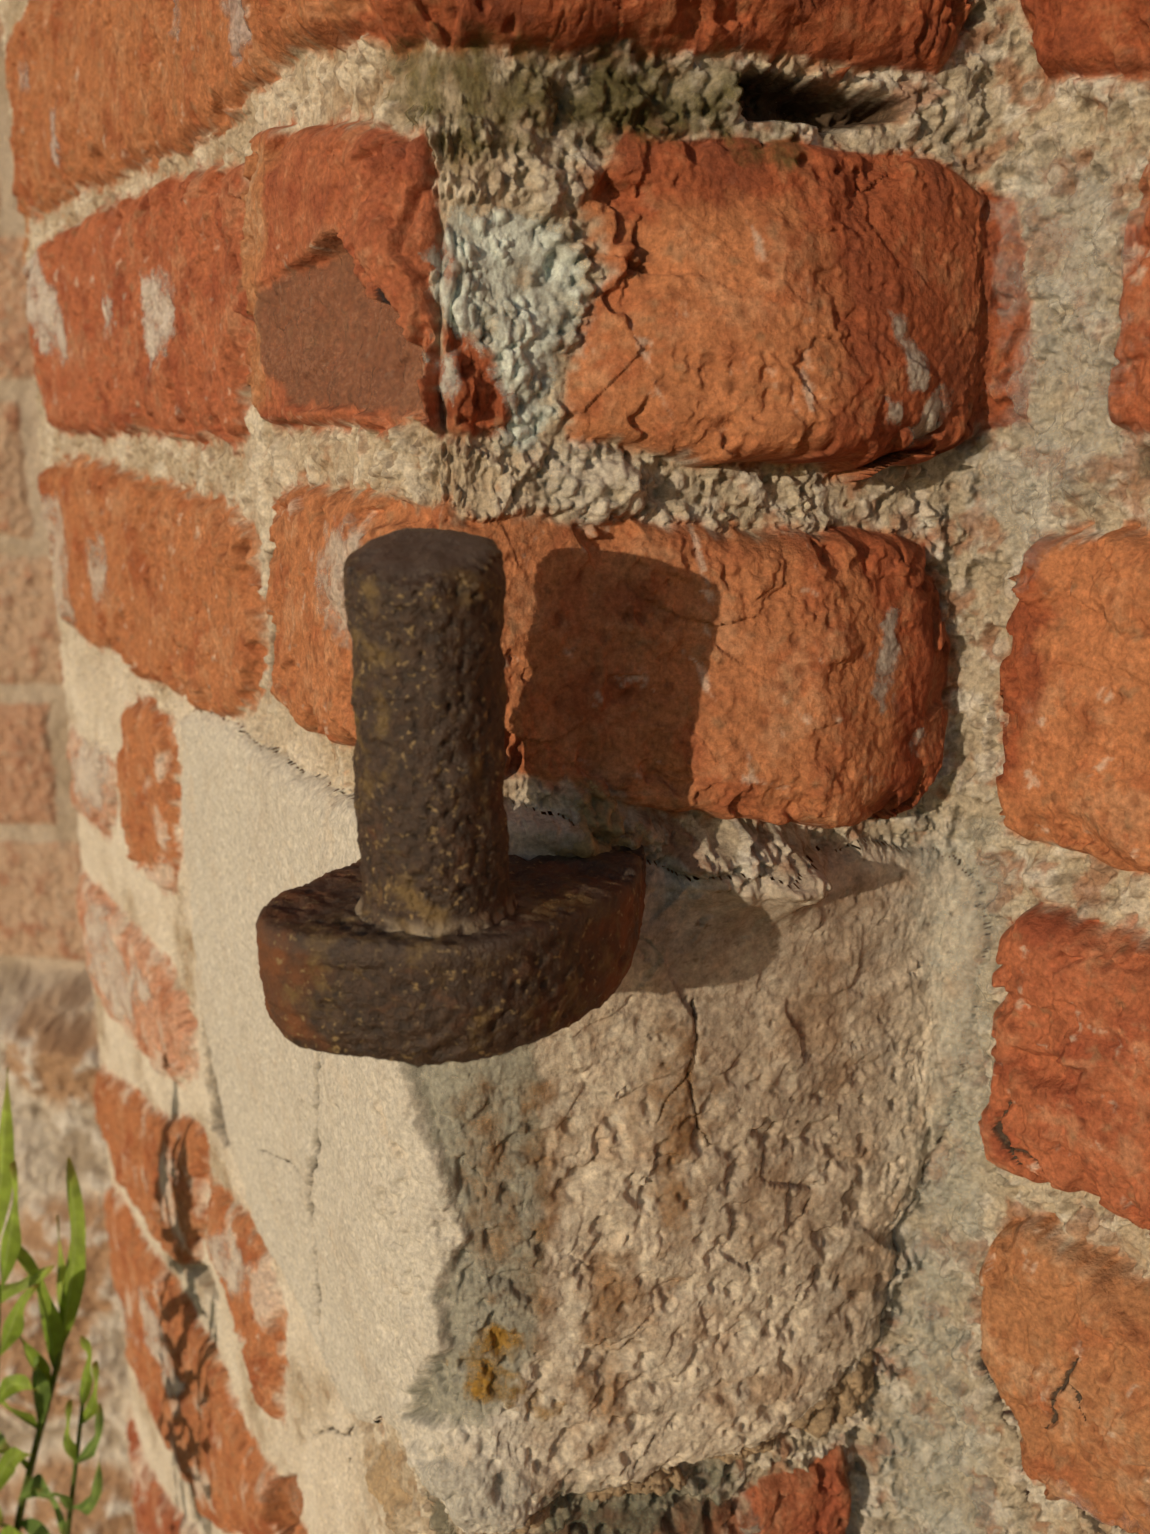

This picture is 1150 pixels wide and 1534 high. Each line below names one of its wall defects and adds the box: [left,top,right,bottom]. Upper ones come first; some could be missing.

crack [659,1000,712,1145]
crack [260,1143,321,1185]